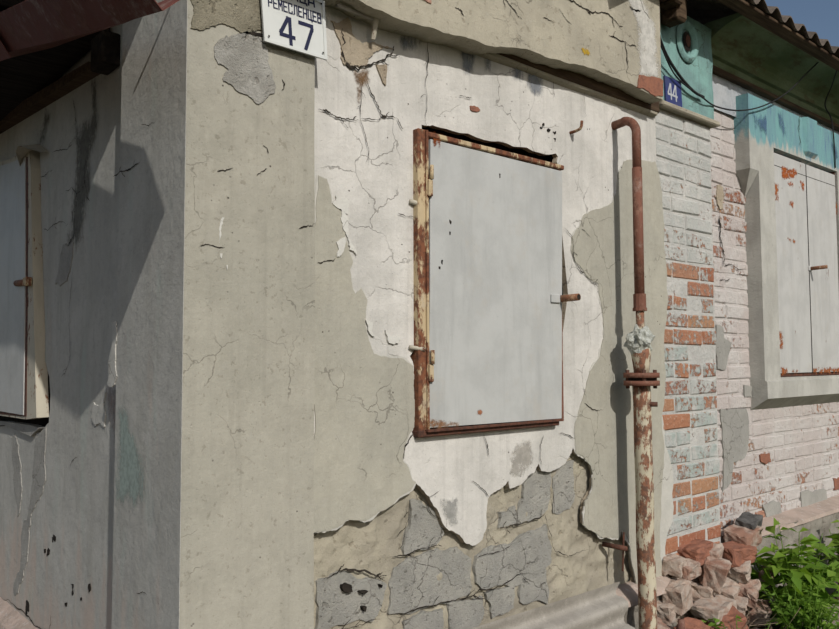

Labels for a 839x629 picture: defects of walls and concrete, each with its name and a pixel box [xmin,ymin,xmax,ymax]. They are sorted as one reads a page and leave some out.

spalling [190,0,276,105]
crack [320,31,403,158]
spalling [331,17,393,86]
crack [543,0,649,68]
flaking render [636,75,663,97]
water stain [68,84,97,242]
rust [775,166,804,200]
peeling [332,196,357,257]
peeling [91,321,117,427]
spalling [11,427,47,596]
spalling [340,583,368,595]